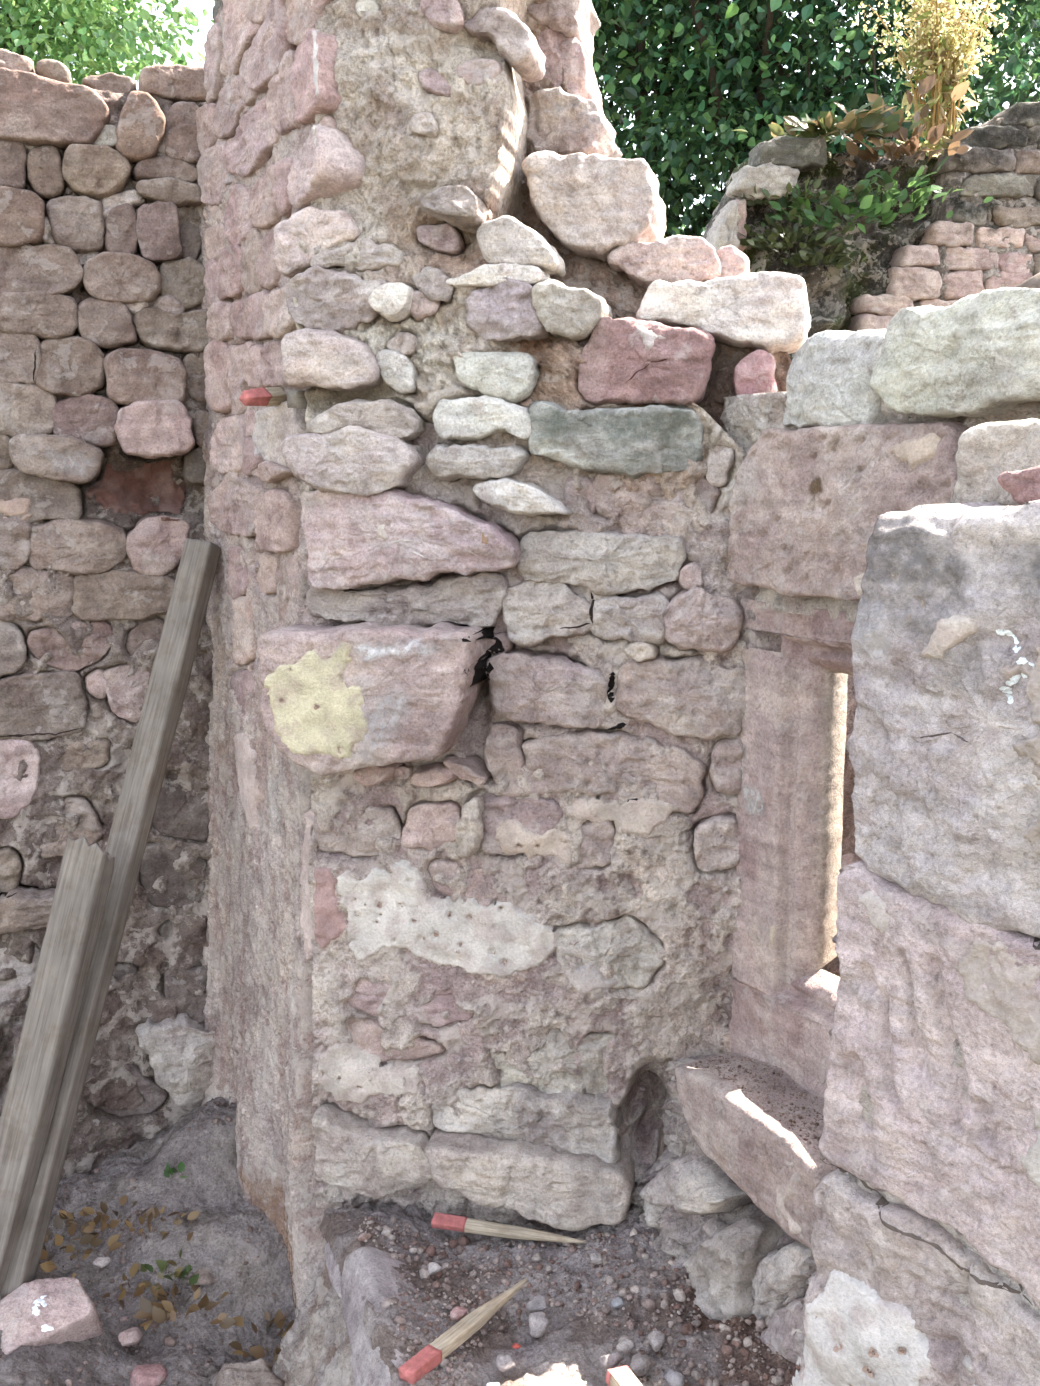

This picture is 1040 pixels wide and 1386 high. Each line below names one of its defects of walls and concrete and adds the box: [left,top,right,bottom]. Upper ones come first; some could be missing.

crack [819,1157,1033,1306]